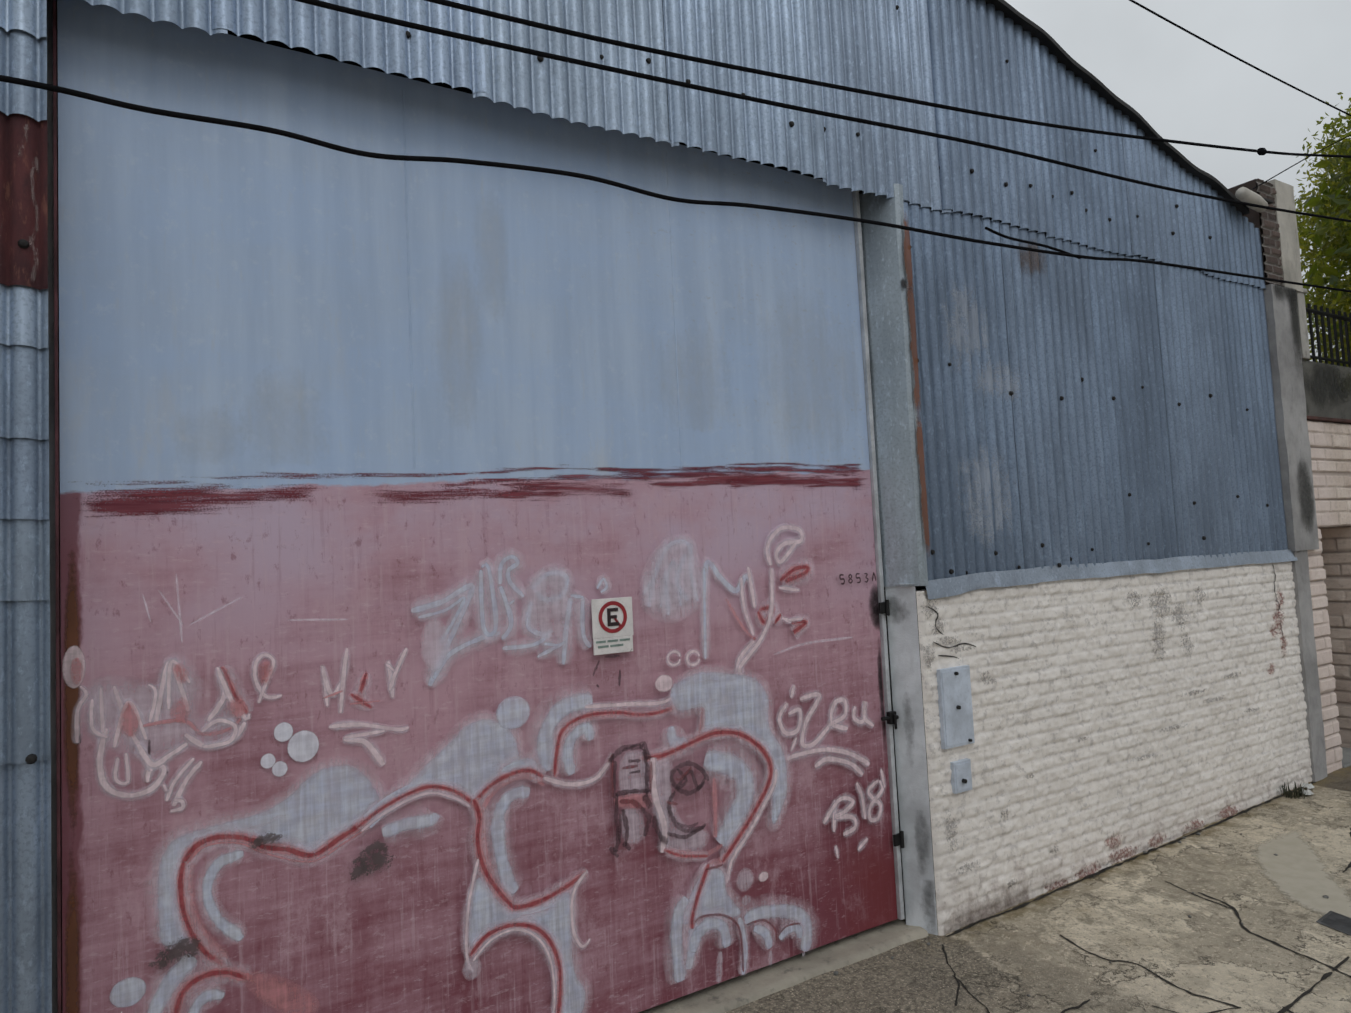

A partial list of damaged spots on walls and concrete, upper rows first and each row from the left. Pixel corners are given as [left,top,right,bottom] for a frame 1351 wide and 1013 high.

leakage [1275,284,1302,359]
corrosion [904,219,930,550]
leakage [1300,465,1314,524]
peeling [1127,585,1206,659]
crack [1165,881,1351,978]
crack [942,944,990,1013]
crack [1060,935,1241,1013]